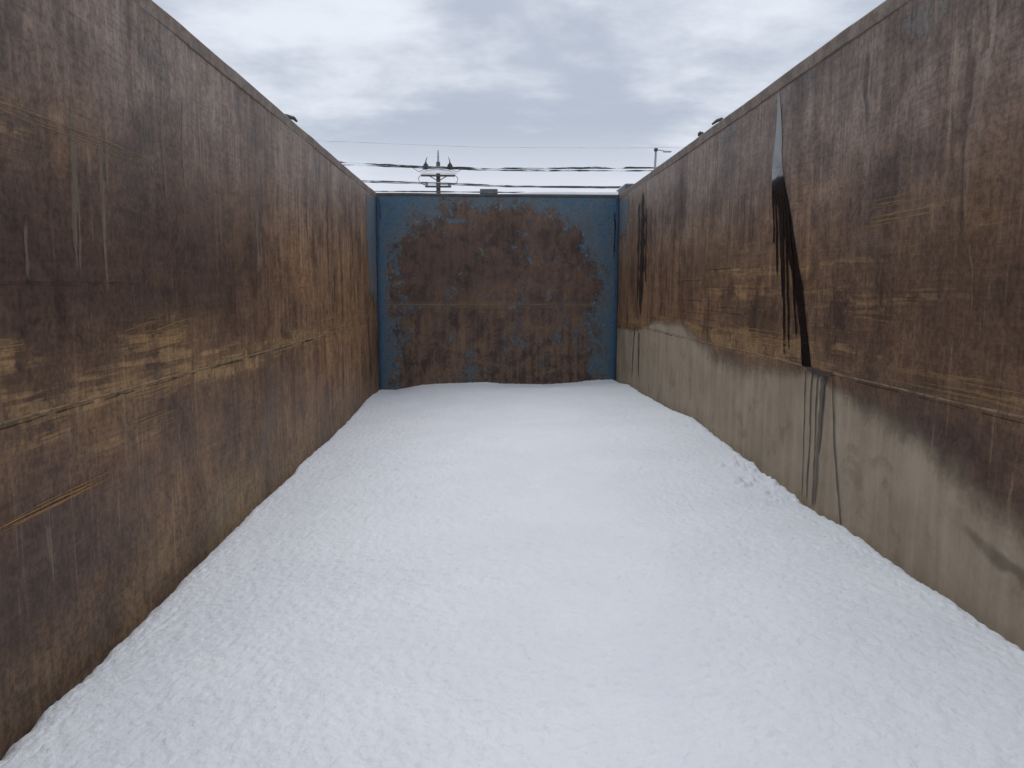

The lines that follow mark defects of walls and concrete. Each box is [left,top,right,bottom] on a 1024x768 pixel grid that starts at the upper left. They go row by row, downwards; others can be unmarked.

water stain [637,194,647,314]
water stain [772,93,841,525]